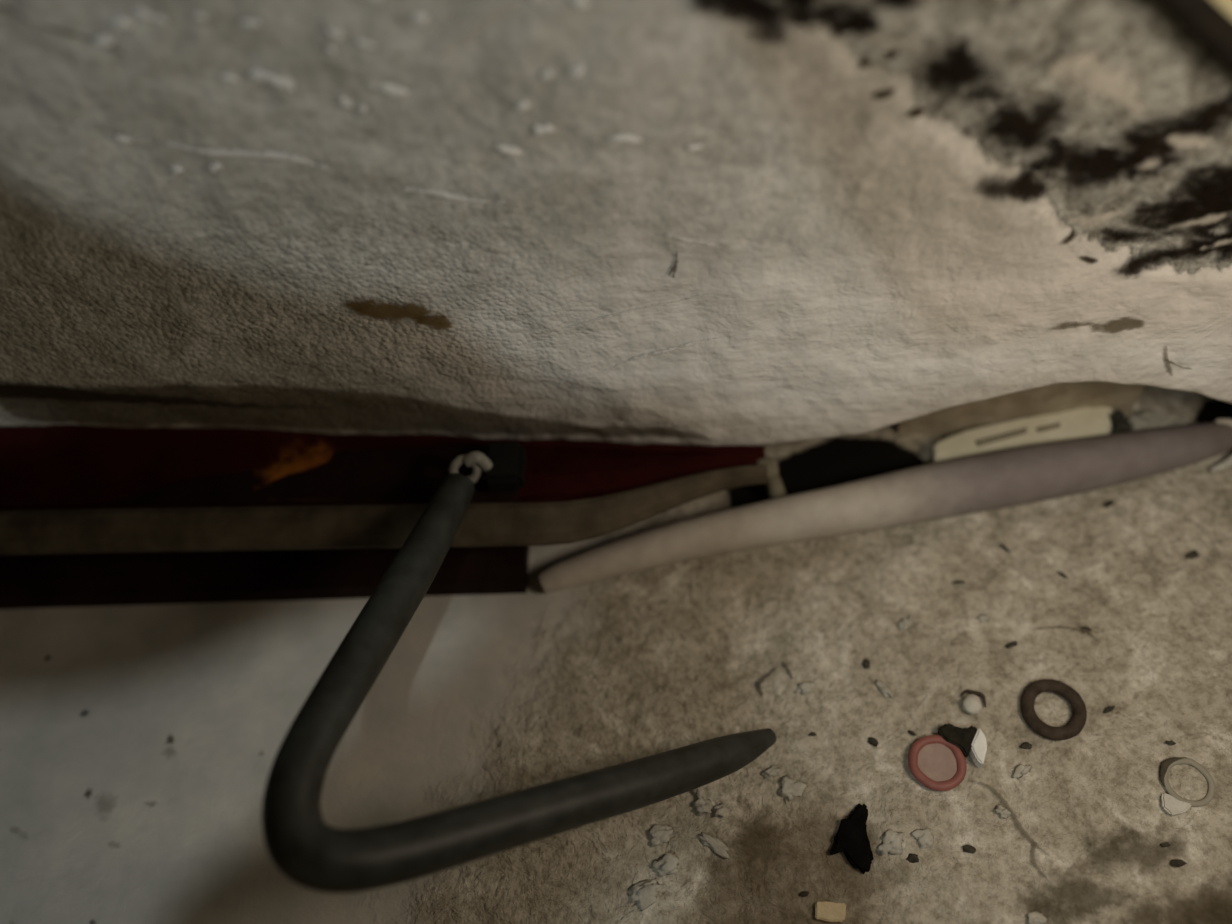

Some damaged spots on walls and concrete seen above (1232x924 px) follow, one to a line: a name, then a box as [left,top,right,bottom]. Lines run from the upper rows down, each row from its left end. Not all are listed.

damp [859,50,899,69]
damp [874,89,895,100]
damp [909,107,925,118]